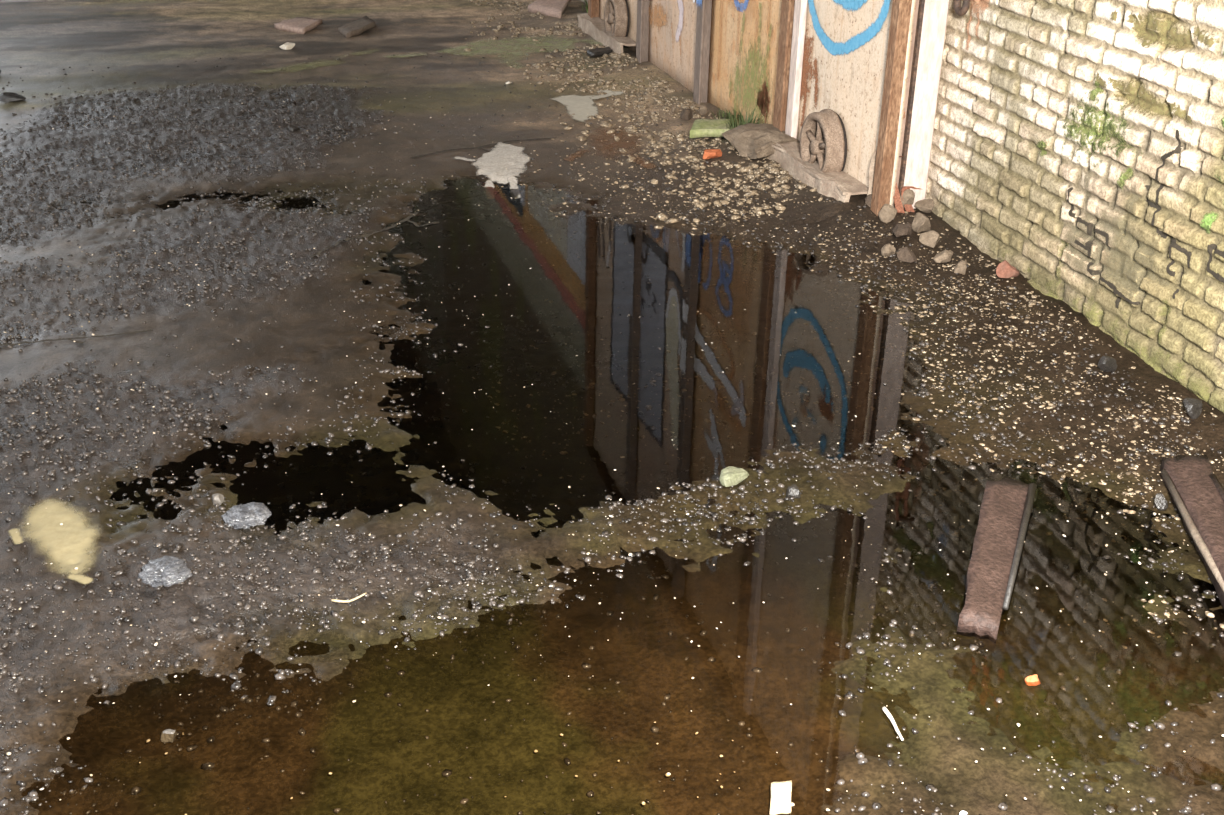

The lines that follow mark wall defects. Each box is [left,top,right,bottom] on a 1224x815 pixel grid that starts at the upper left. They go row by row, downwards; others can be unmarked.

rust [966,0,989,50]
crack [1067,187,1139,309]
crack [1145,130,1224,299]